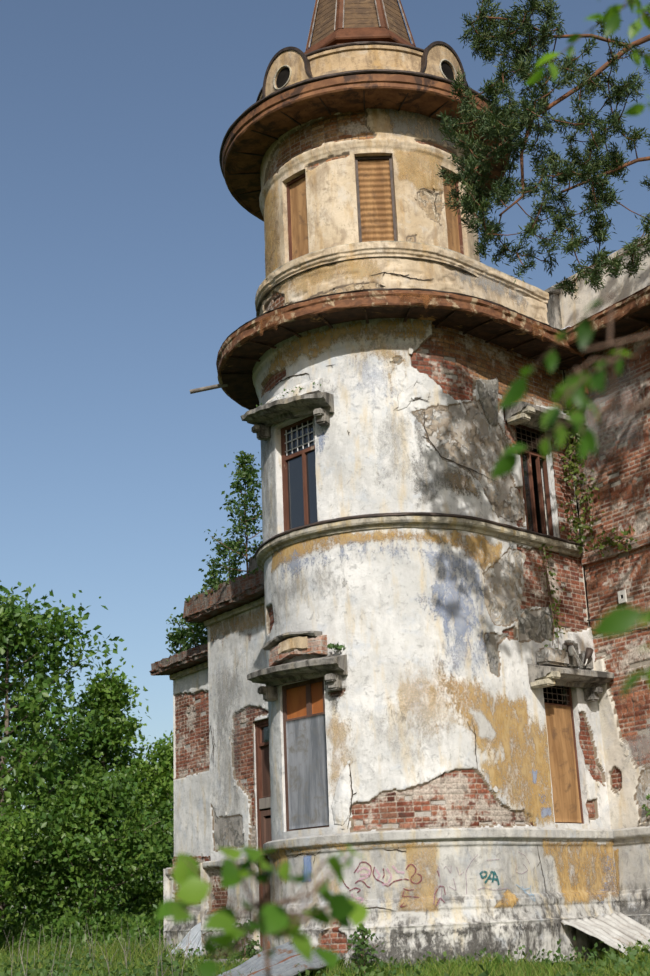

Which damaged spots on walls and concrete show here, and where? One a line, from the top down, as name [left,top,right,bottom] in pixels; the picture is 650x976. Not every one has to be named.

flaking render [263,108,374,276]
flaking render [263,318,650,831]
flaking render [175,691,210,779]
flaking render [214,703,348,871]
flaking render [190,853,228,913]
peeling [369,842,438,911]
peeling [494,890,518,908]